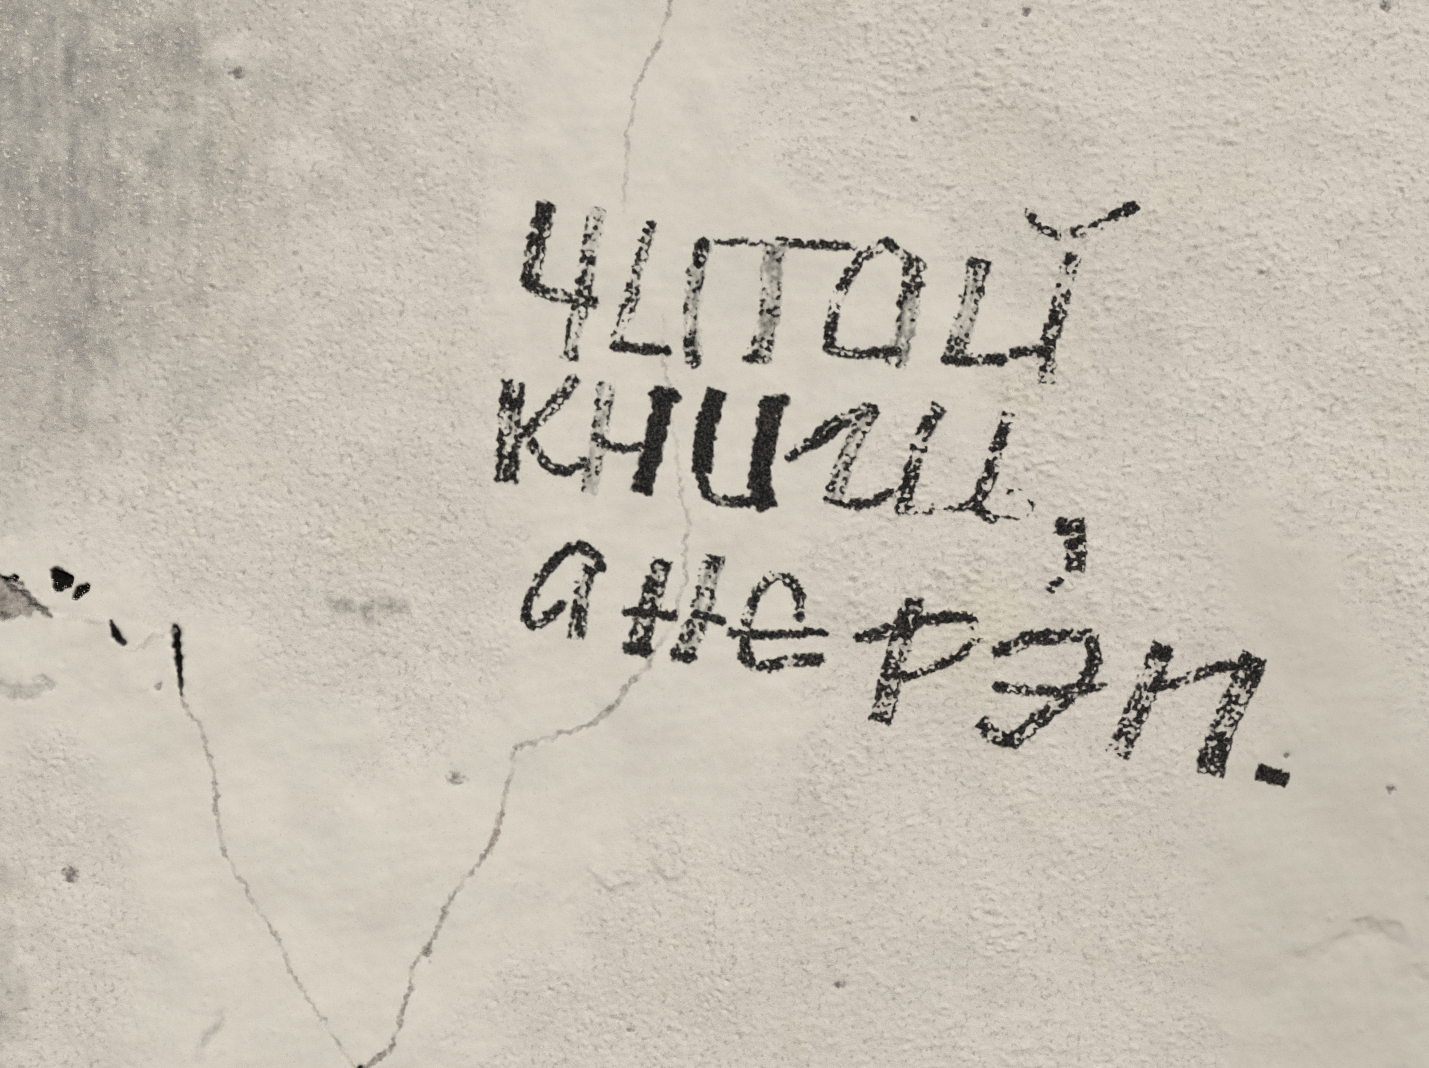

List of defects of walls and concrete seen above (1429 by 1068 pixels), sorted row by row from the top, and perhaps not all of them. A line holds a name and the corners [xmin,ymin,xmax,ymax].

spalling [0,575,45,618]
crack [172,624,183,695]
crack [357,987,411,1068]